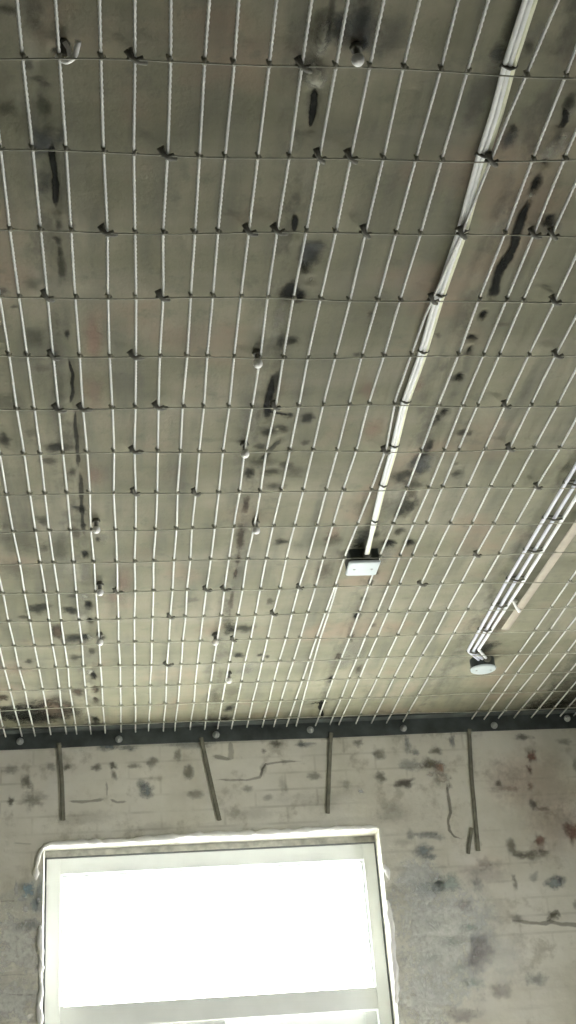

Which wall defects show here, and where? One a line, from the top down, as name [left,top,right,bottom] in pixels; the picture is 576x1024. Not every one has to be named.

damp [332,7,374,50]
damp [0,689,82,723]
crack [446,787,455,837]